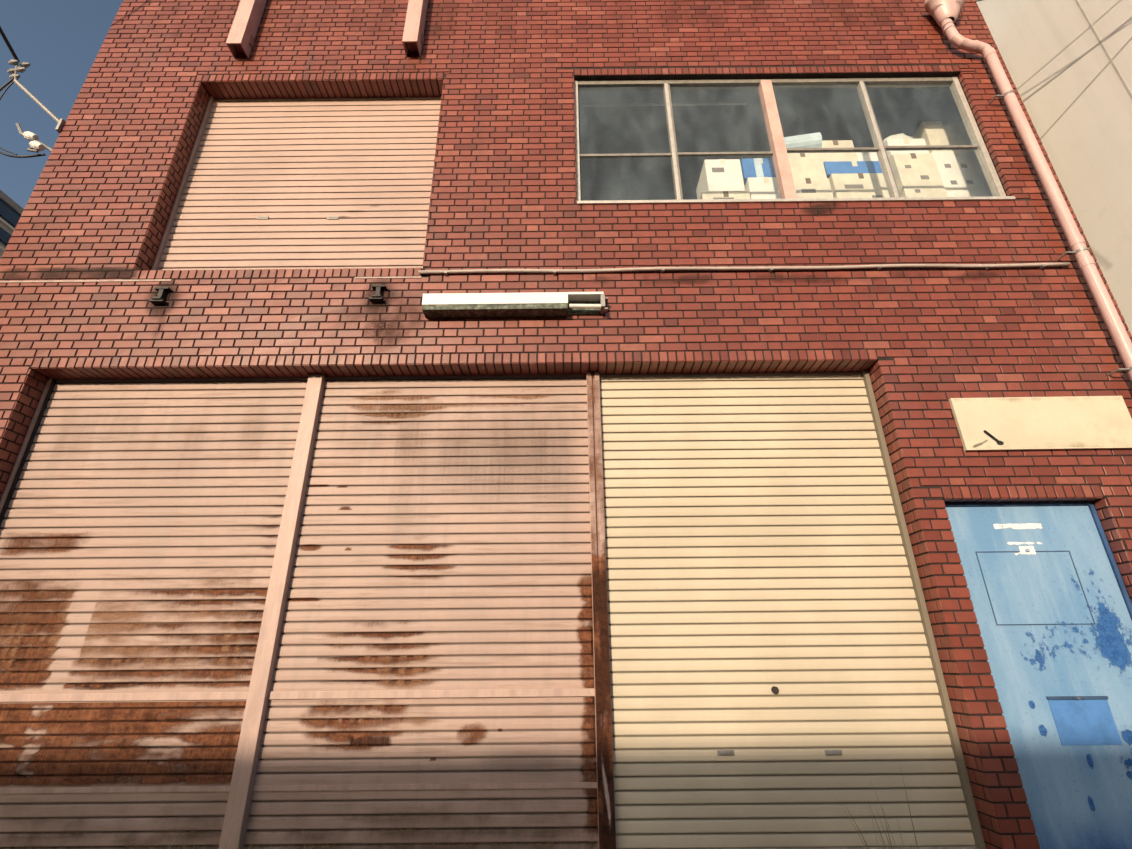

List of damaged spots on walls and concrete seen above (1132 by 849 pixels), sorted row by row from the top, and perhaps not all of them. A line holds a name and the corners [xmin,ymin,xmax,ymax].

corrosion [353,391,551,423]
corrosion [589,437,604,501]
corrosion [4,534,90,555]
corrosion [384,544,453,577]
peeling [1022,570,1132,671]
corrosion [0,578,268,786]
corrosion [327,632,436,687]
corrosion [577,531,616,849]
corrosion [301,705,427,750]
corrosion [458,726,502,745]
peeling [1122,730,1132,779]